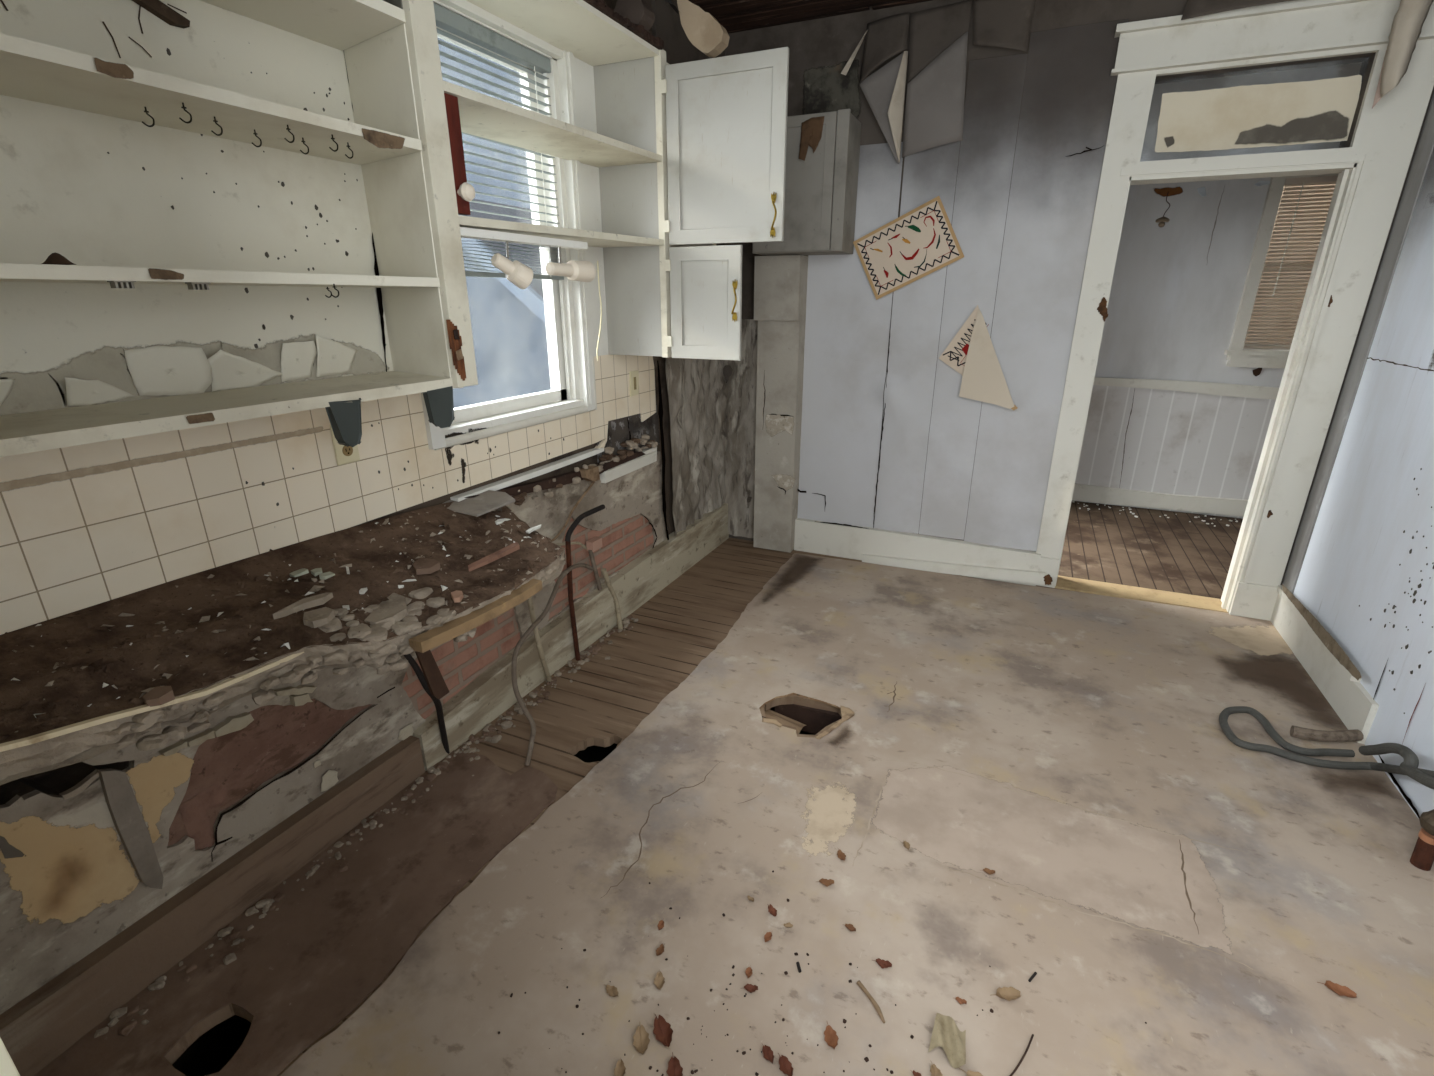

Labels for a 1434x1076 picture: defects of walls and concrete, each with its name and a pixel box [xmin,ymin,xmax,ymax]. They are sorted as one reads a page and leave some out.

peeling [1155,75,1362,153]
peeling [0,334,389,415]
peeling [186,413,215,424]
damp [1221,655,1343,727]
spalling [59,769,99,800]
flaking render [126,685,373,850]
crack [1379,683,1426,818]
peeling [0,795,140,924]
crack [601,762,720,898]